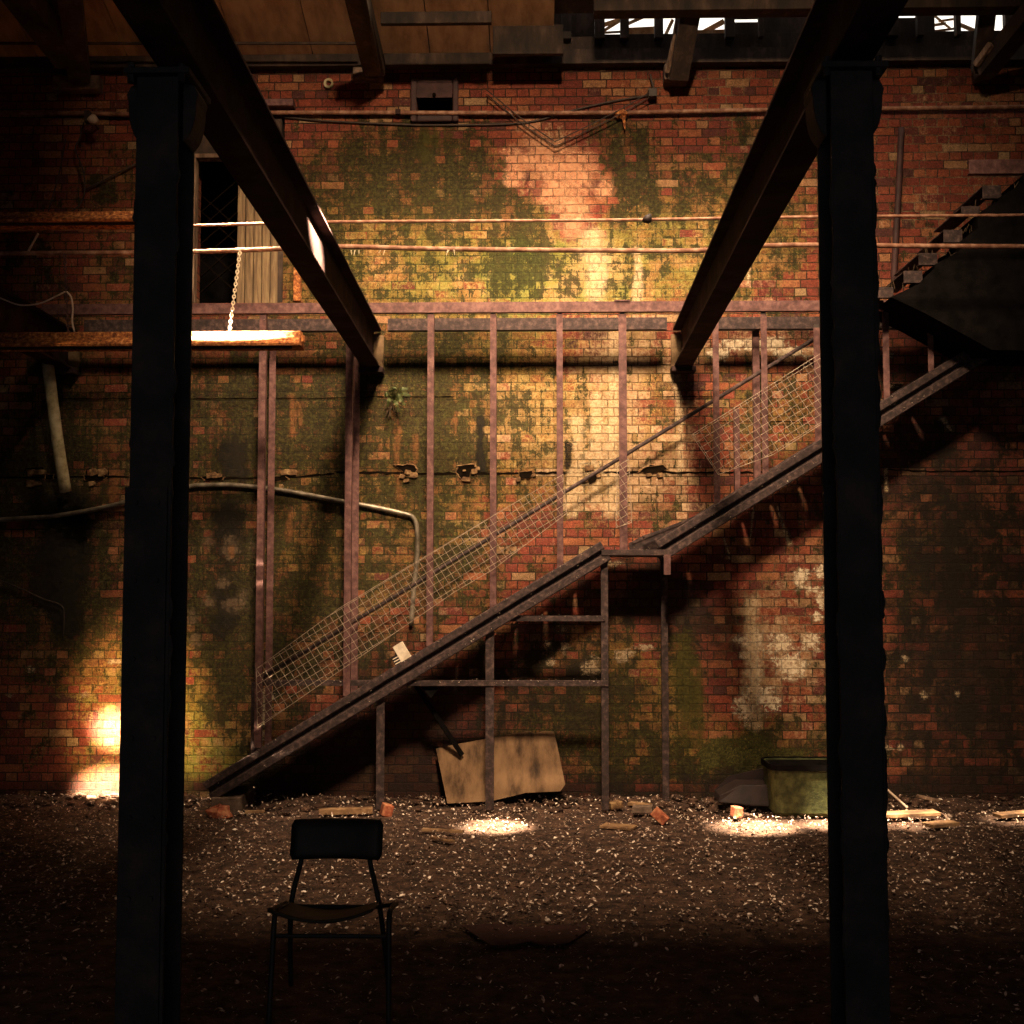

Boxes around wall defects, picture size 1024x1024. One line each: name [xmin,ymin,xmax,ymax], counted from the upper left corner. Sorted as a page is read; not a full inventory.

crack [189,472,258,480]
spalling [394,463,418,483]
spalling [455,463,492,482]
crack [286,461,762,485]
spalling [516,470,536,482]
spalling [638,464,669,478]
efflorescence [731,564,824,724]